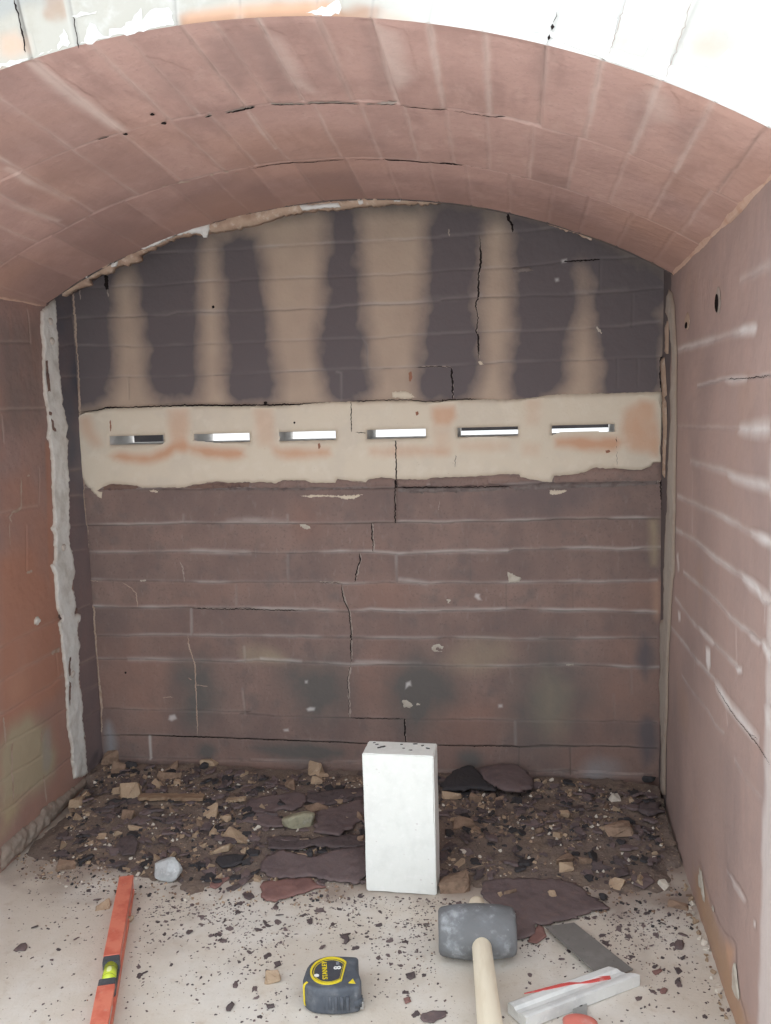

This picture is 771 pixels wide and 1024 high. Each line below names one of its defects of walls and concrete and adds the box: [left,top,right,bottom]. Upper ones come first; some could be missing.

crack [205,101,505,118]
crack [251,159,467,169]
crack [474,236,482,358]
rust [79,407,336,469]
rust [365,401,513,461]
rust [521,395,661,462]
crack [320,441,397,717]